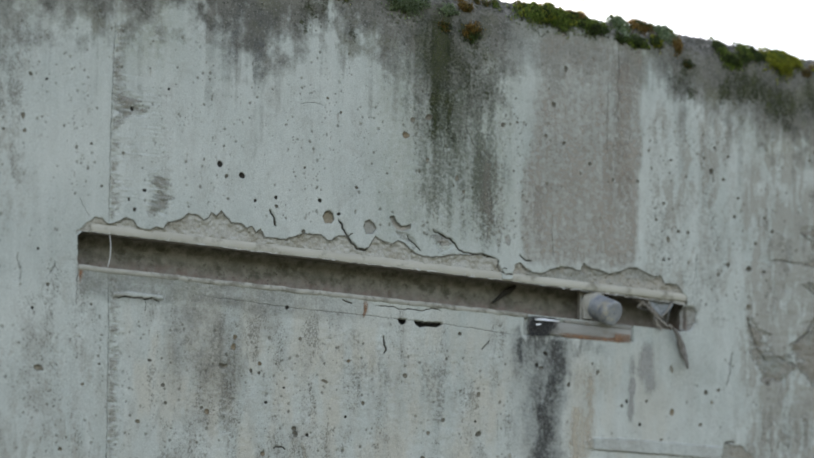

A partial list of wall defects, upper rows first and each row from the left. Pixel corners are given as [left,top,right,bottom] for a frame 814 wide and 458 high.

spalling [77,211,502,280]
spalling [512,263,696,331]